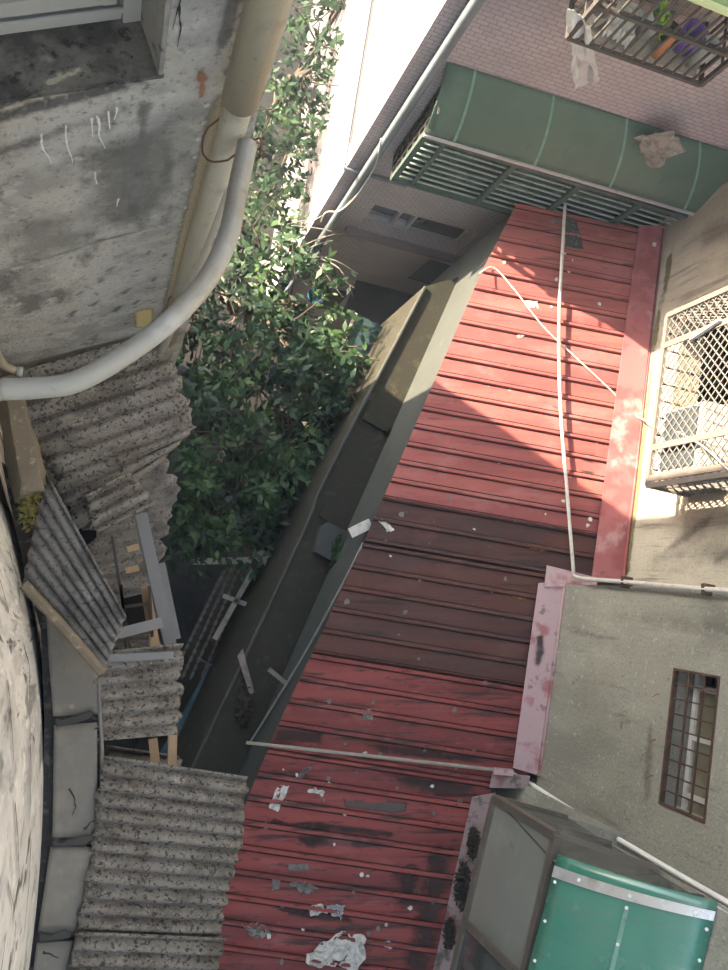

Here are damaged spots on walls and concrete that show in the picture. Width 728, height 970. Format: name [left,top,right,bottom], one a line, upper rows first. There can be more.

crack [172,0,182,47]